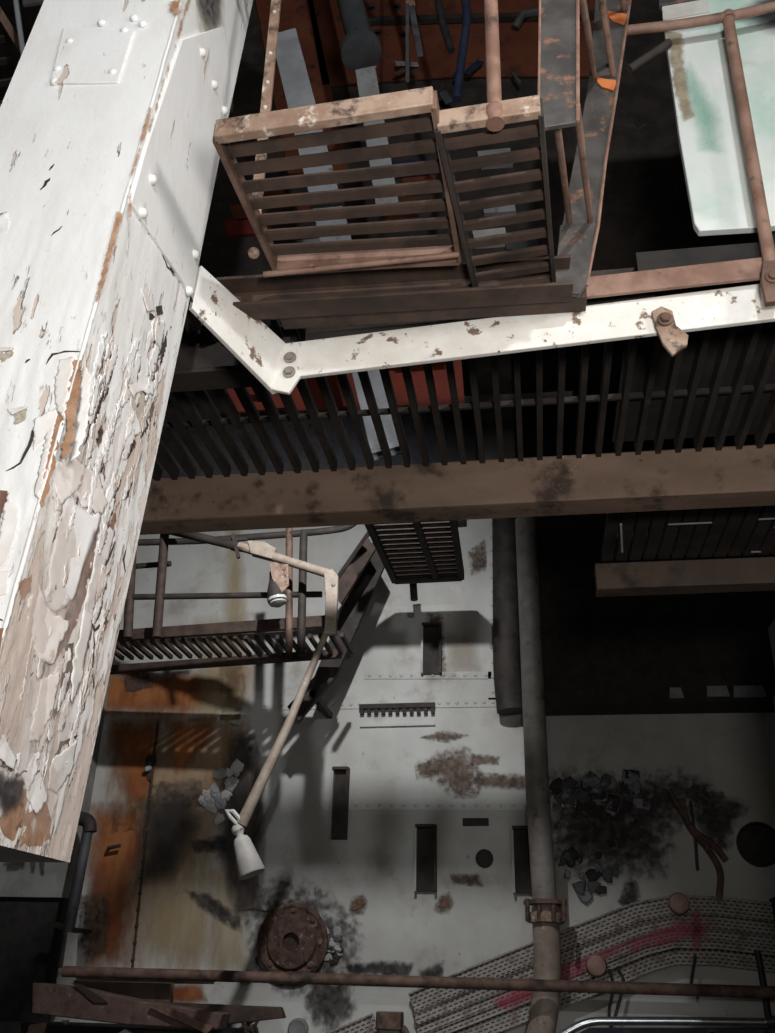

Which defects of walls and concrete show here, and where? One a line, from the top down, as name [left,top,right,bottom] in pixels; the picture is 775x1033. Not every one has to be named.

rust [170,0,190,46]
rust [96,67,169,301]
peeling [0,289,171,847]
rust [79,668,251,964]
rust [424,732,462,742]